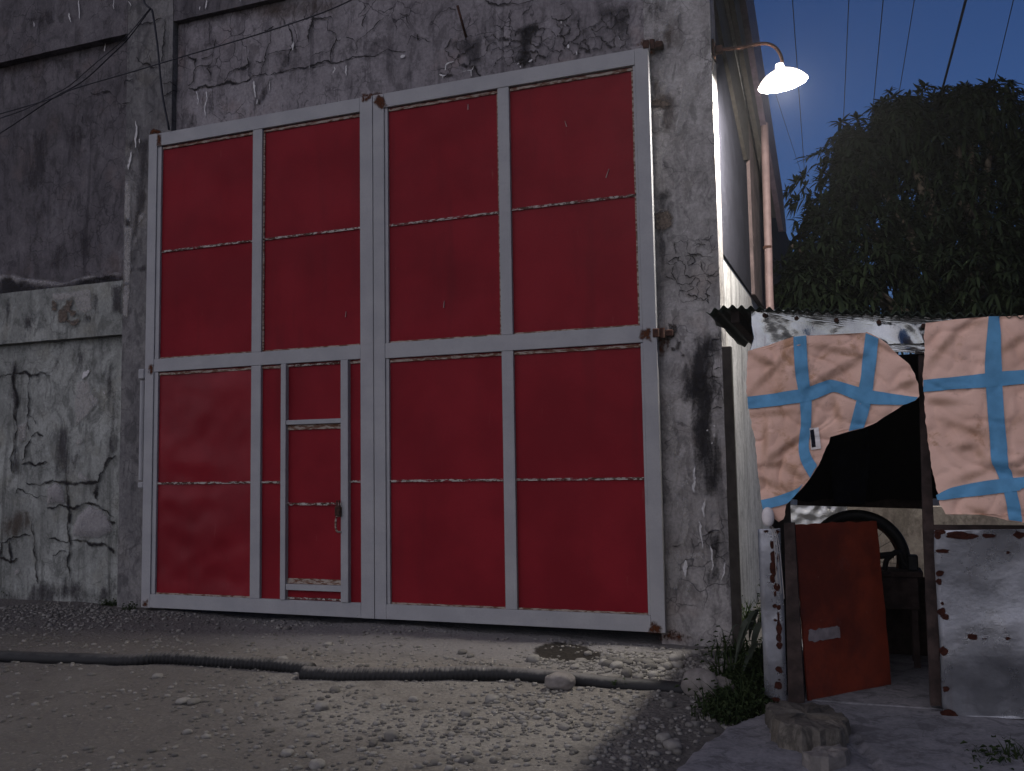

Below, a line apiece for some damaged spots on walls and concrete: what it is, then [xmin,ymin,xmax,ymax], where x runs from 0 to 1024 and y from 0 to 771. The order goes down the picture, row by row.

crack [82,0,629,119]
crack [666,235,719,303]
crack [0,369,115,582]
leakage [683,337,725,582]
rust [764,530,783,649]
rust [933,530,996,553]